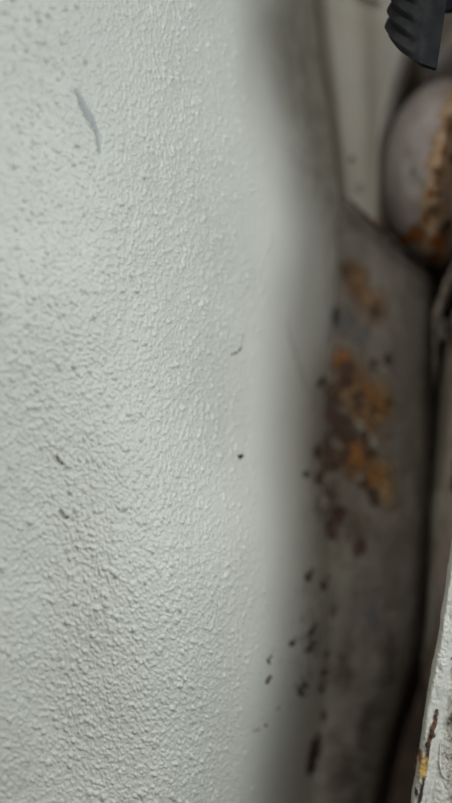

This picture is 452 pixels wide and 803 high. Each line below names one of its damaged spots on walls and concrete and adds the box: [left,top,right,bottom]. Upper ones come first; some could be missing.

corrosion [397,88,452,274]